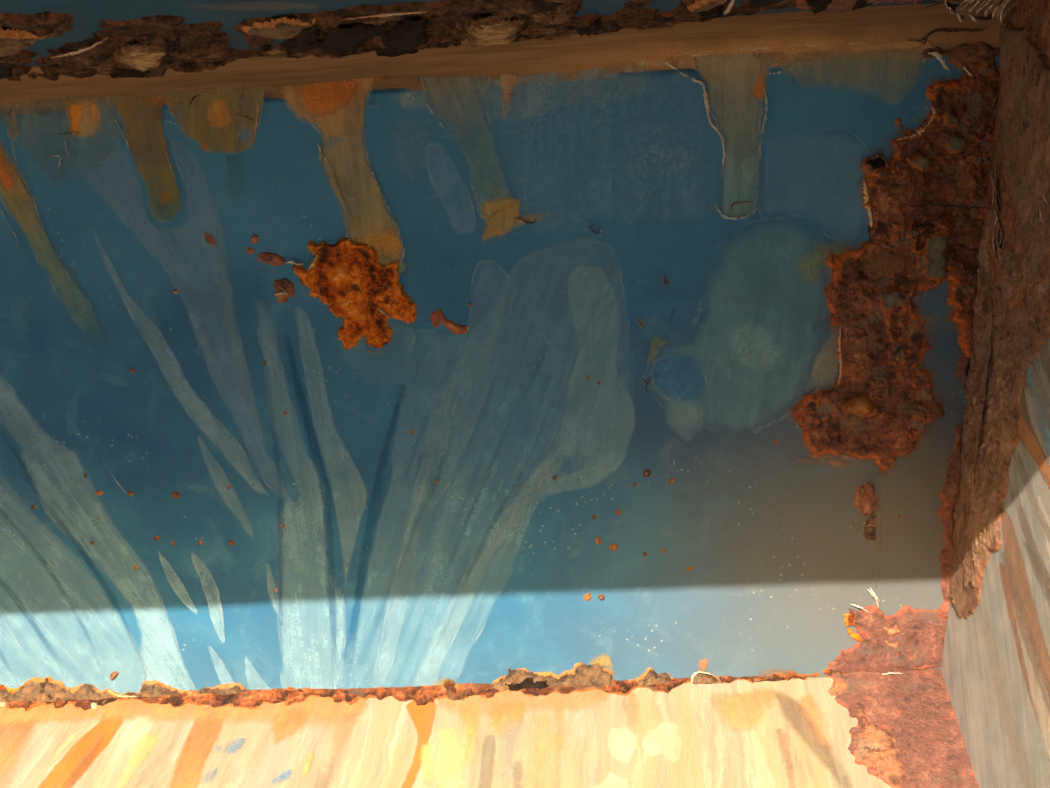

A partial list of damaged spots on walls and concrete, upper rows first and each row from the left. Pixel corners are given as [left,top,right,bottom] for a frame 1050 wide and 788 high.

peeling [945,0,1019,26]
rust [0,140,96,330]
rust [114,78,417,350]
rust [664,53,793,220]
rust [791,0,1050,619]
damp [154,336,247,478]
rust [0,605,979,788]